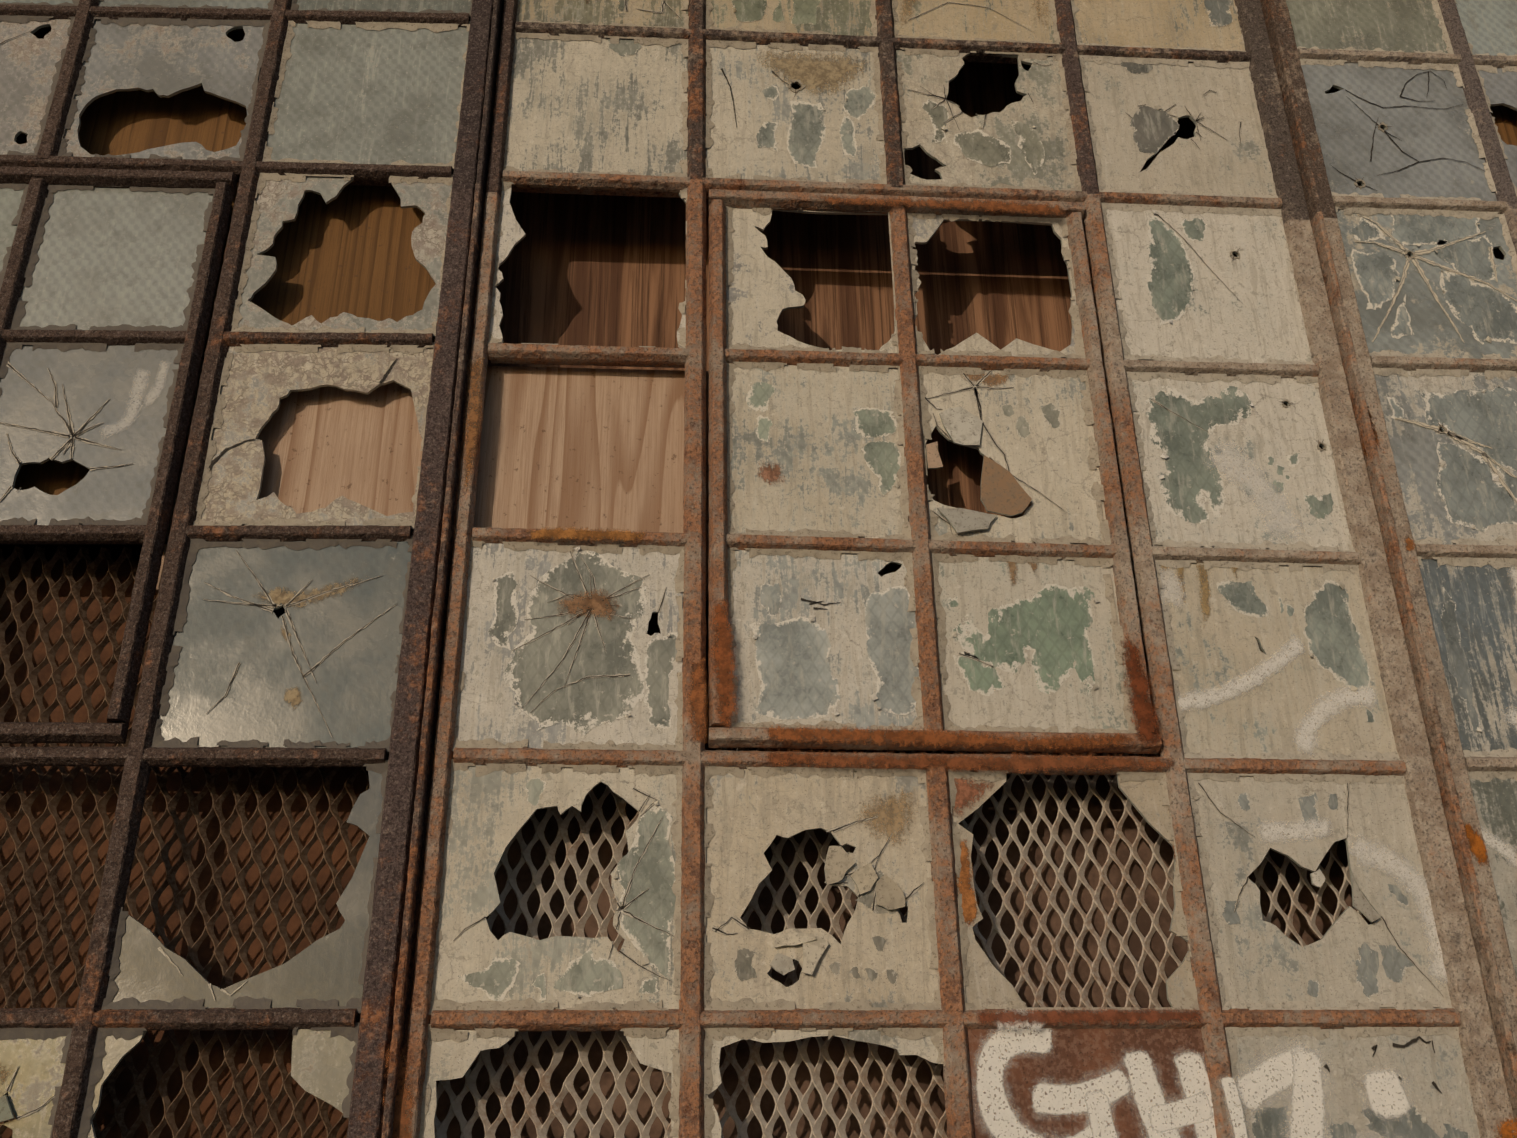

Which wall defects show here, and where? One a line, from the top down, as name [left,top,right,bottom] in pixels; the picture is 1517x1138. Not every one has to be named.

rust [821,195,1064,215]
peeling [1146,210,1207,326]
crack [1331,71,1517,343]
crack [0,362,133,501]
peeling [1145,386,1254,524]
crack [1395,418,1517,503]
crack [203,550,398,738]
peeling [488,546,677,735]
rust [689,600,737,741]
rust [763,637,1173,813]
peeling [948,584,1100,696]
rust [1465,824,1488,864]